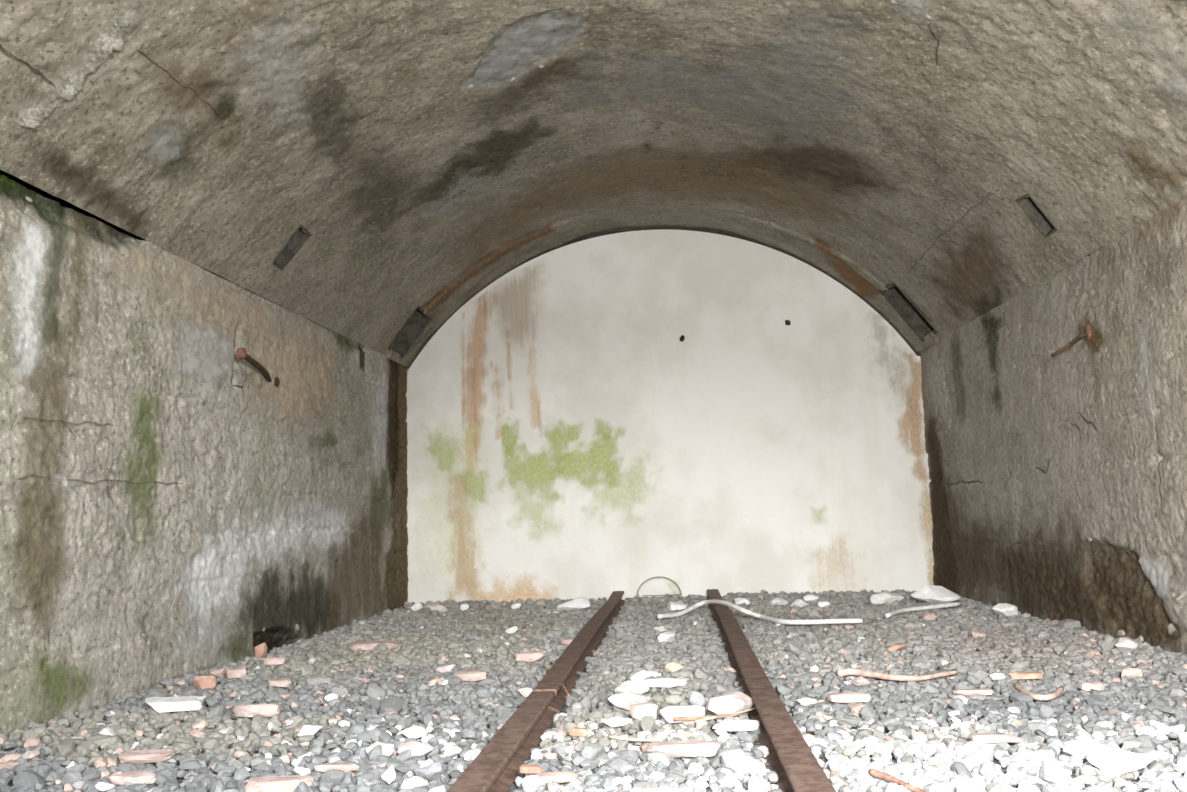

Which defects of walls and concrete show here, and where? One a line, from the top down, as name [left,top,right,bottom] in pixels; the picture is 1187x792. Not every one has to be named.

crack [0,44,61,91]
leakage [240,22,407,218]
leakage [416,119,552,219]
crack [23,417,113,433]
crack [17,474,183,505]
rust [165,263,333,420]
leakage [175,348,409,660]
rust [467,299,486,467]
rust [450,483,552,602]
rust [902,356,934,585]
rust [1079,321,1102,354]
spalling [1083,537,1181,646]